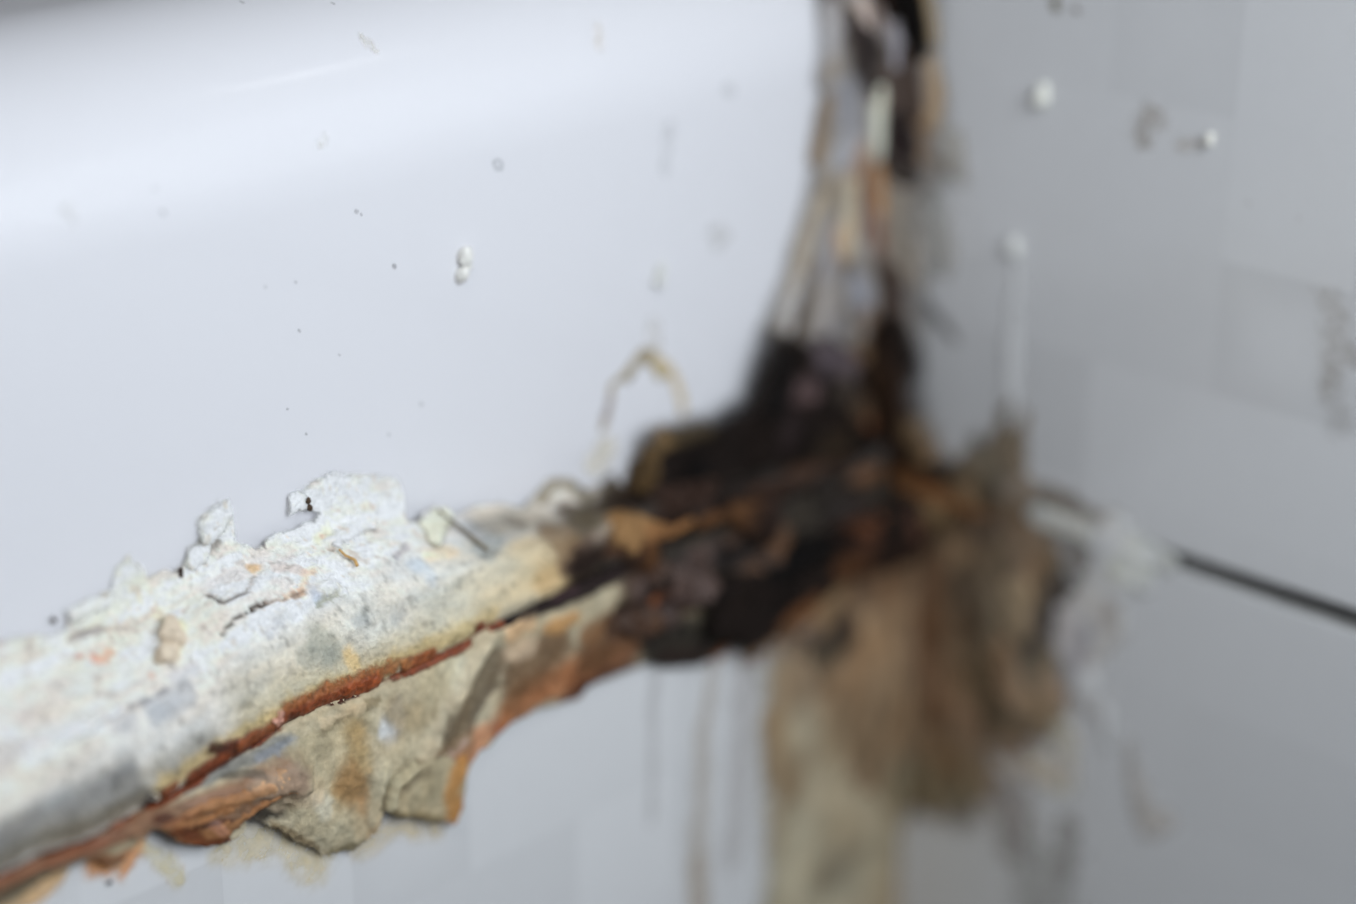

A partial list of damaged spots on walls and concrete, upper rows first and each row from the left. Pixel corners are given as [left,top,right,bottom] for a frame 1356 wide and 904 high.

peeling [288,491,308,515]
peeling [419,507,454,545]
water stain [594,315,1102,904]
peeling [383,753,469,825]
rust [87,840,147,875]
rust [11,869,67,904]